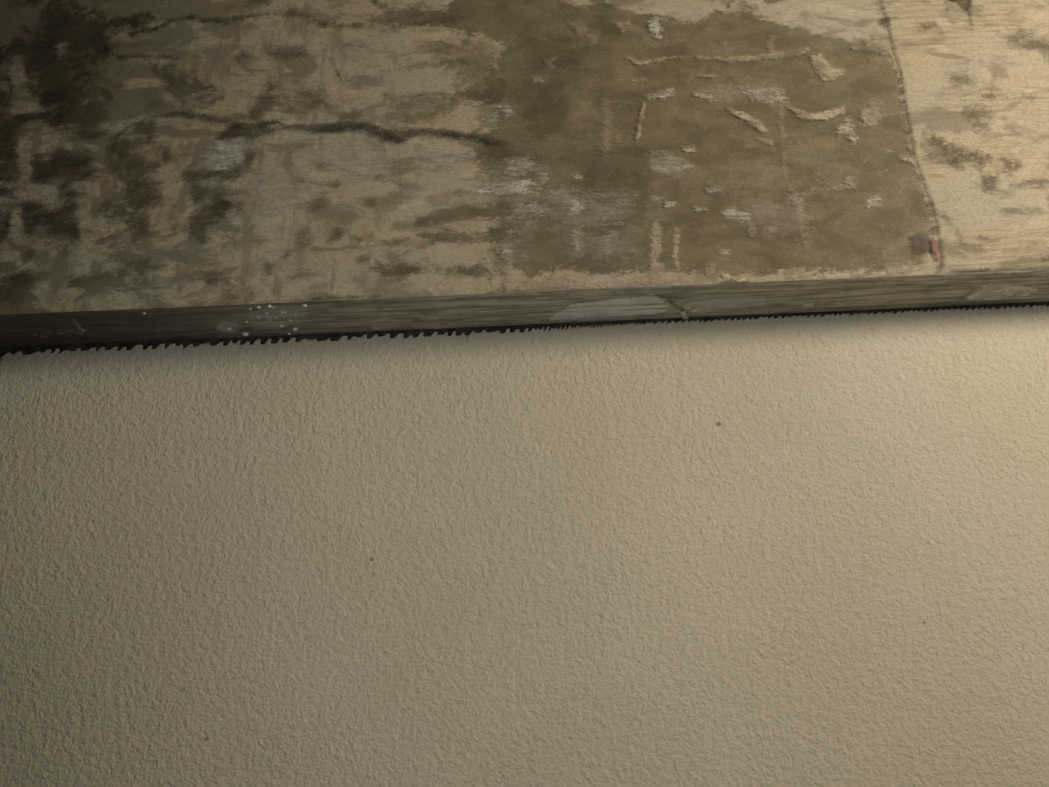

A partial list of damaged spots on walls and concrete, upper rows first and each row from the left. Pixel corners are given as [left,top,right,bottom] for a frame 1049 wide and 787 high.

leakage [22,148,94,237]
leakage [0,0,175,197]
leakage [101,122,171,241]
leakage [174,139,266,243]
crack [154,111,502,144]
leakage [372,0,934,278]